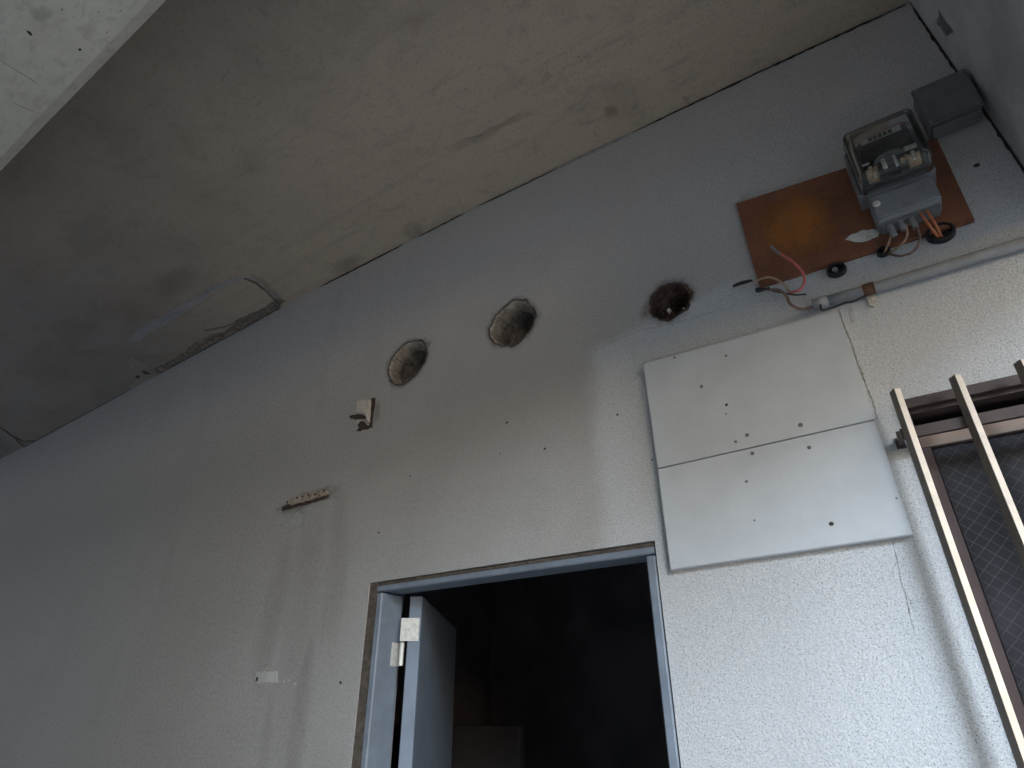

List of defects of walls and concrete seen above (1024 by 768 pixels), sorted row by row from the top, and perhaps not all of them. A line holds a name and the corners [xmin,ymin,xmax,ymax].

spalling [155,277,286,376]